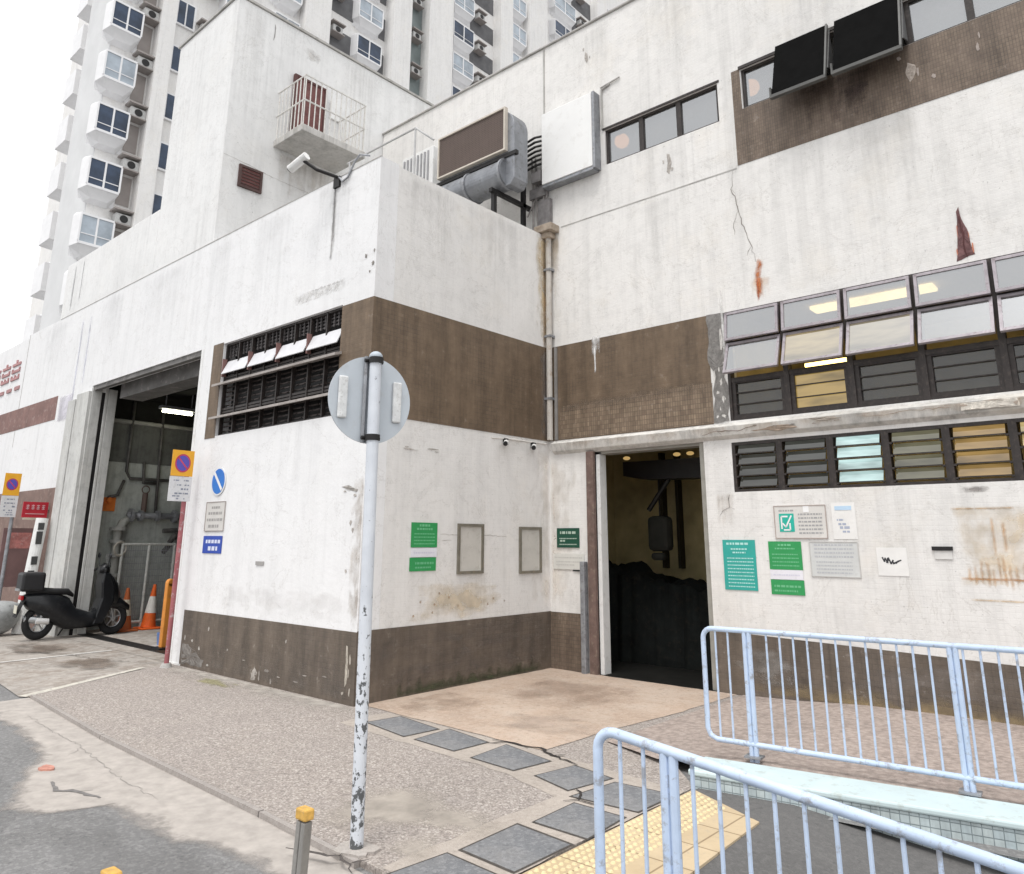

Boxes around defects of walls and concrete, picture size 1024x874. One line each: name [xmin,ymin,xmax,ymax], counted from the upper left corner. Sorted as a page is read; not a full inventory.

peeling [897,57,919,82]
crack [730,172,756,261]
peeling [560,313,729,439]
crack [491,739,594,804]